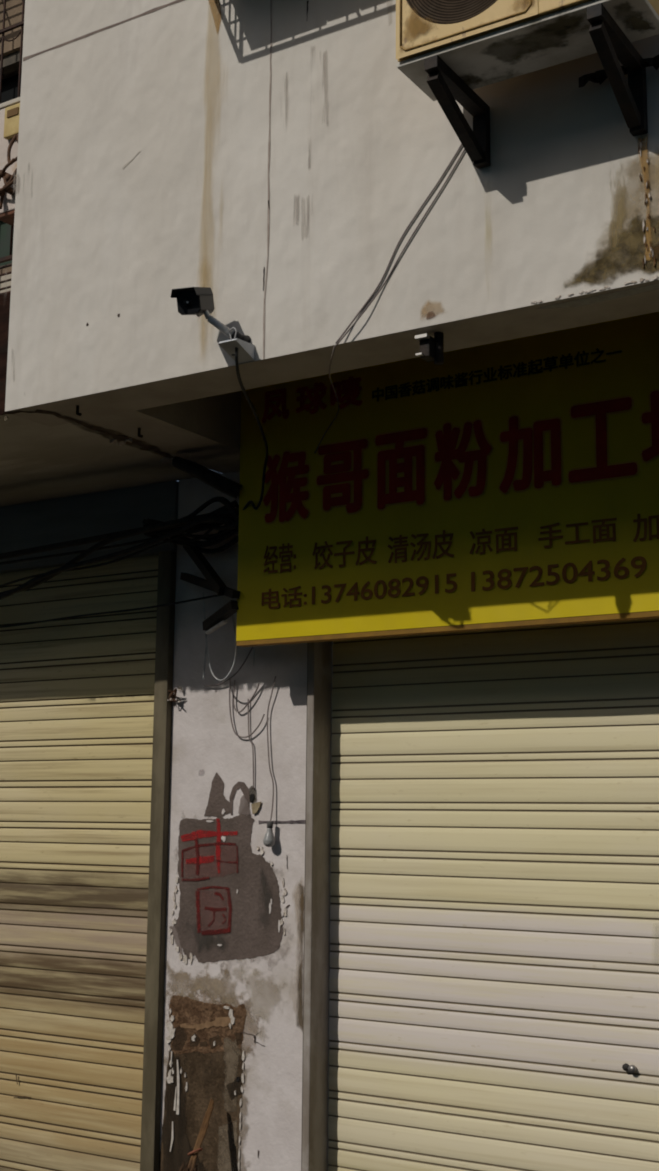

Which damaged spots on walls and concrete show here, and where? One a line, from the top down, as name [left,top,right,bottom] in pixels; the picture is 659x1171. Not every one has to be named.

corrosion [209,0,222,33]
peeling [531,138,659,309]
corrosion [638,134,652,260]
water stain [168,966,241,1003]
water stain [159,1039,248,1171]
flaking render [166,990,258,1171]